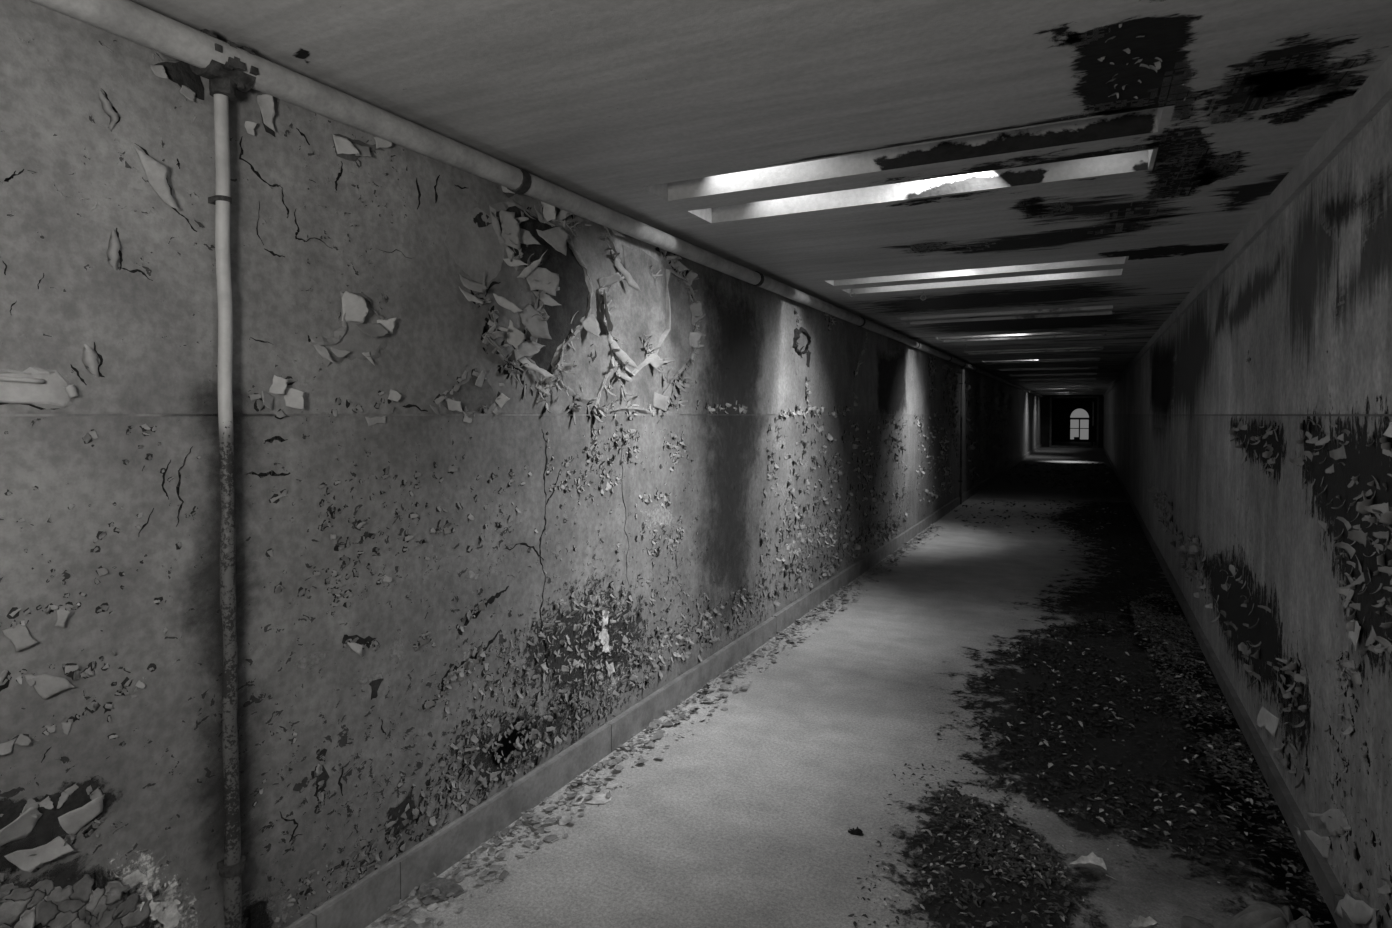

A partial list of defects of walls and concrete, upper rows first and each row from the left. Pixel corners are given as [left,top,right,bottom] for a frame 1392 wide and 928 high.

peeling [416,175,467,209]
peeling [0,342,104,410]
peeling [0,423,201,652]
peeling [243,185,953,928]
peeling [1175,394,1392,789]
peeling [0,648,157,763]
peeling [1294,808,1392,928]